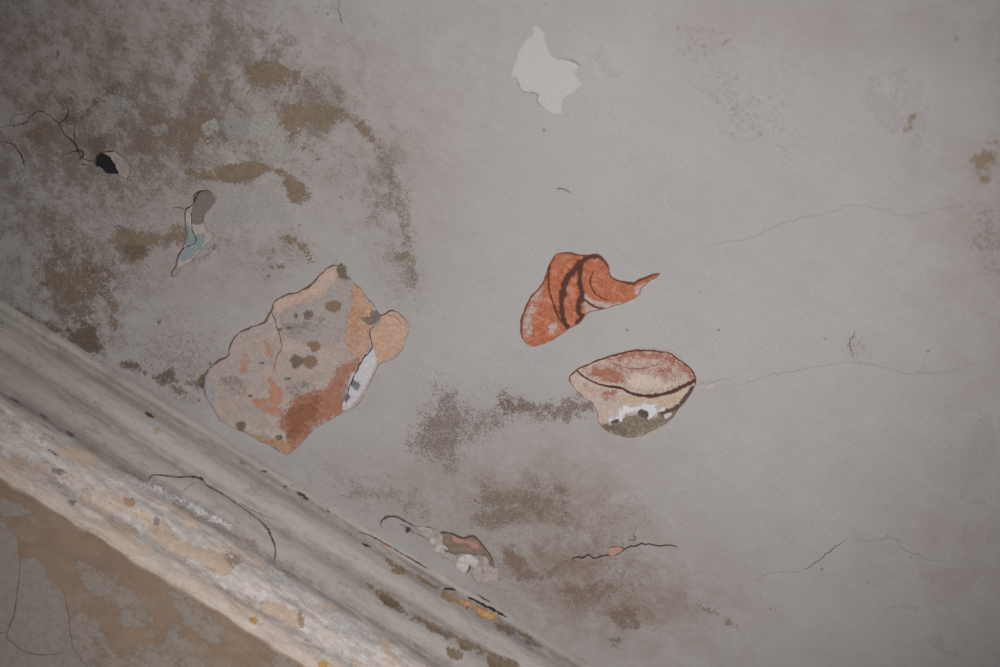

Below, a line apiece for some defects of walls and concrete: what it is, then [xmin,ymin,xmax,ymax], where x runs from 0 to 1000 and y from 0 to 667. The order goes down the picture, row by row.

crack [2,109,94,169]
water stain [114,103,312,205]
water stain [238,54,423,299]
spalling [171,190,216,278]
water stain [16,222,189,358]
spalling [520,252,660,347]
spalling [198,263,410,455]
spalling [569,347,696,438]
water stain [332,372,600,520]
crack [149,474,276,560]
flaking render [380,515,499,586]
crack [562,533,679,562]